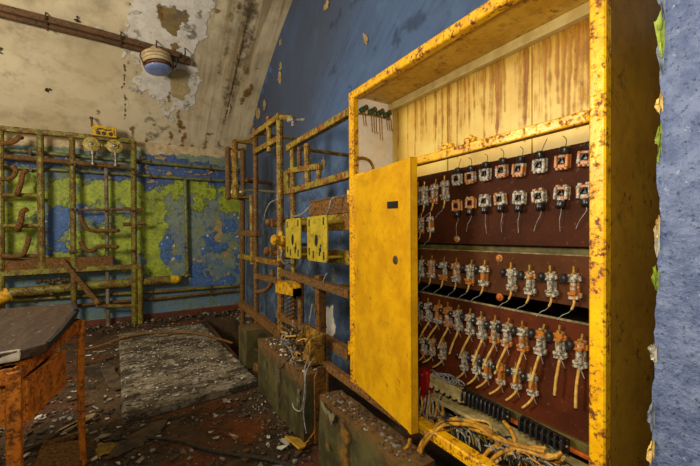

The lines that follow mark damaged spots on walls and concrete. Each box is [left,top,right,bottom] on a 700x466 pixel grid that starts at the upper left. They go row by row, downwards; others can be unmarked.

peeling [119,0,216,121]
rust [168,110,193,147]
peeling [249,62,282,136]
peeling [4,148,246,291]
peeling [326,304,336,337]